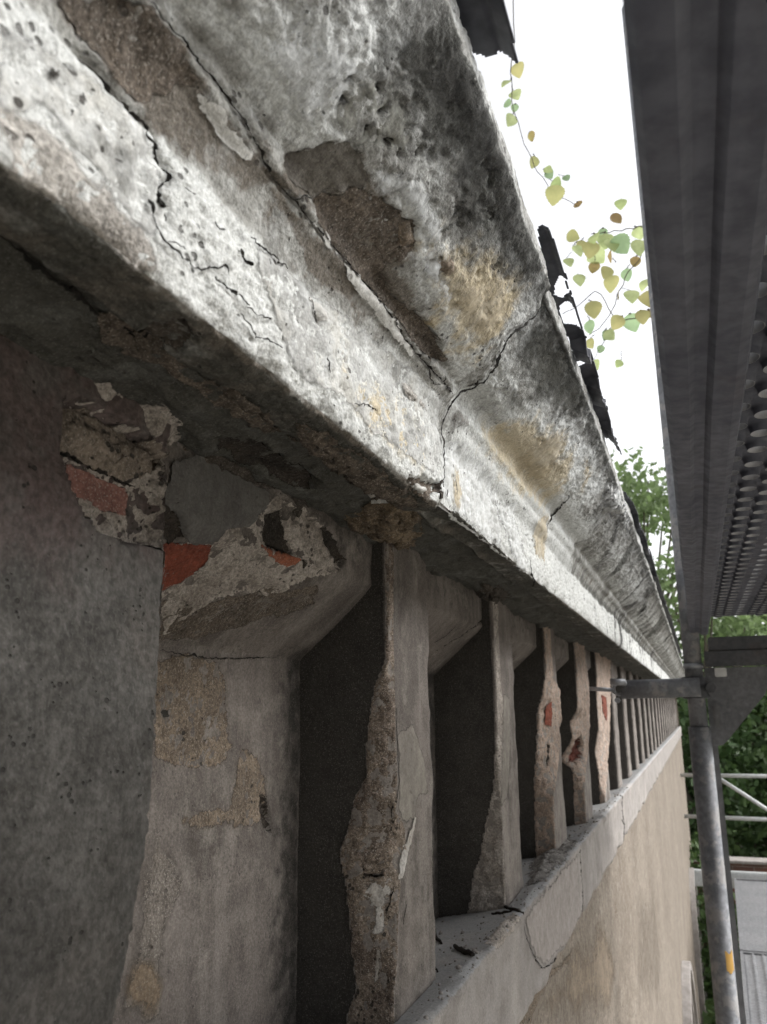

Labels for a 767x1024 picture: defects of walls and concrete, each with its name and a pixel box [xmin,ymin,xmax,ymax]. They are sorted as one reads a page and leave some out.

peeling [0,33,160,272]
peeling [58,0,254,161]
crack [78,59,288,348]
crack [150,2,539,497]
leakage [380,175,450,300]
spalling [438,256,454,276]
spalling [60,382,347,641]
spalling [258,74,448,1024]
peeling [154,653,271,832]
spalling [534,627,611,857]